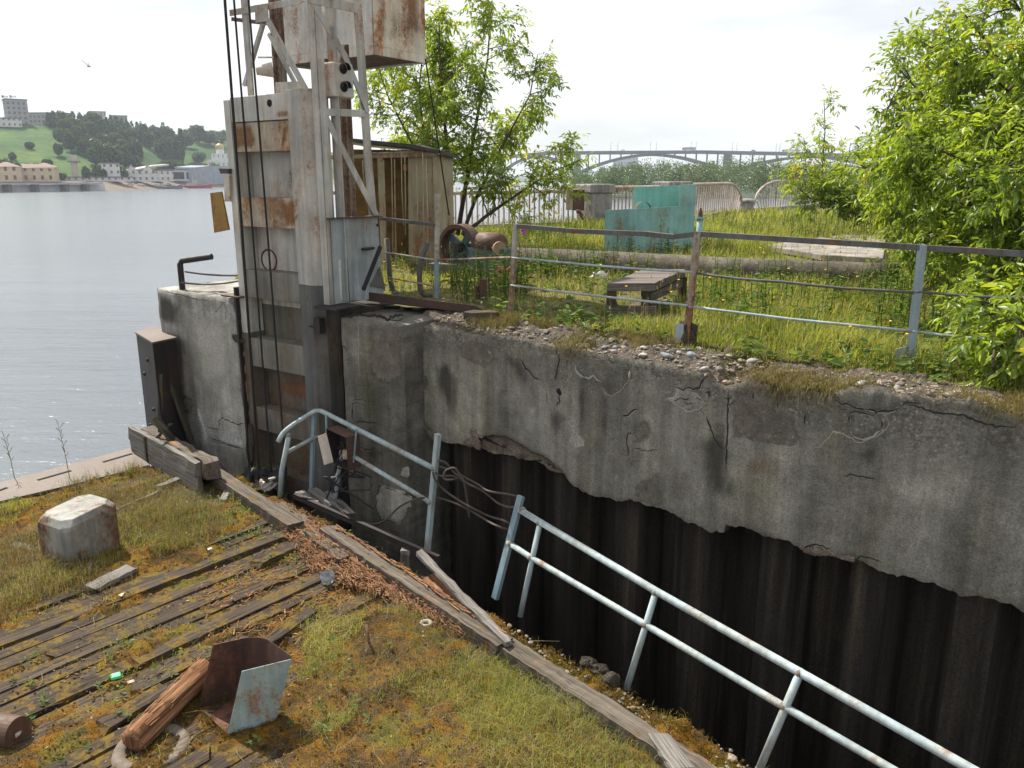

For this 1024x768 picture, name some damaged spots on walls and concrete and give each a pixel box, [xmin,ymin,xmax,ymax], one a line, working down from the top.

corrosion [394,0,418,36]
corrosion [282,202,295,223]
leakage [440,366,454,404]
spalling [461,429,563,473]
crack [623,409,656,453]
crack [676,376,735,476]
leakage [708,440,724,489]
crack [773,400,934,449]